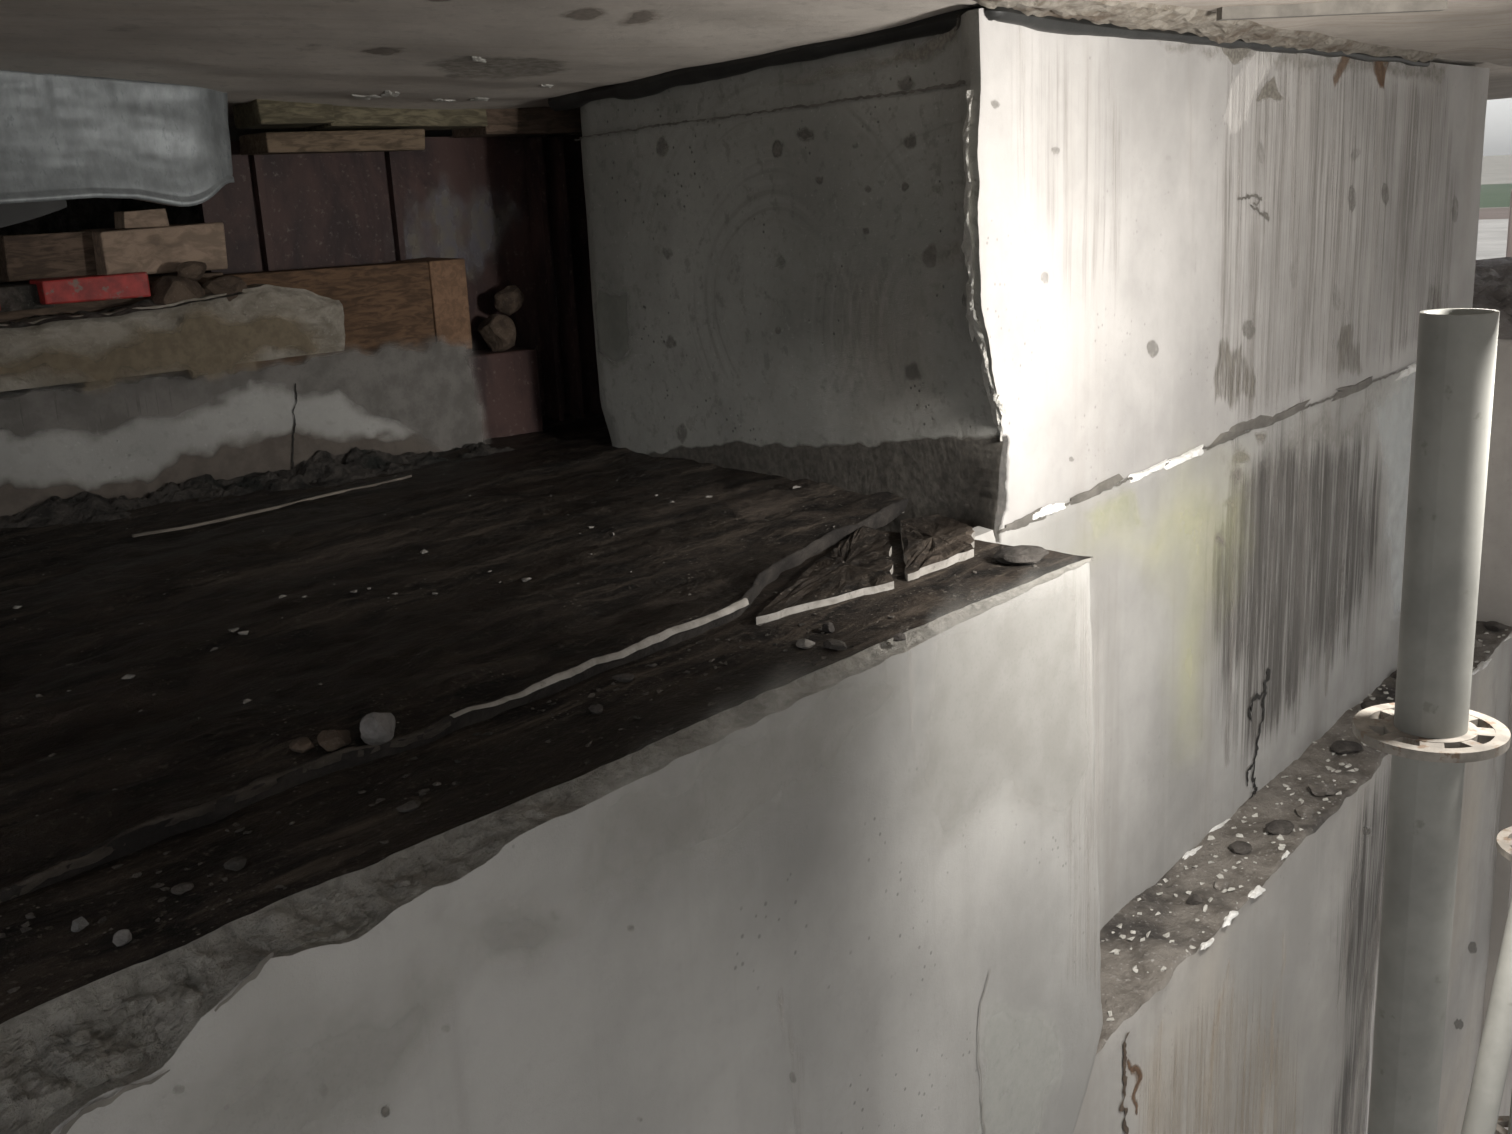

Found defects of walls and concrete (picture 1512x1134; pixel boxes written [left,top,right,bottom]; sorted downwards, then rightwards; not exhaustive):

spalling [649,90,1009,542]
leakage [1215,62,1446,415]
leakage [0,340,485,517]
leakage [1033,503,1066,520]
leakage [1128,444,1204,483]
leakage [1213,363,1416,746]
crack [1247,668,1271,798]